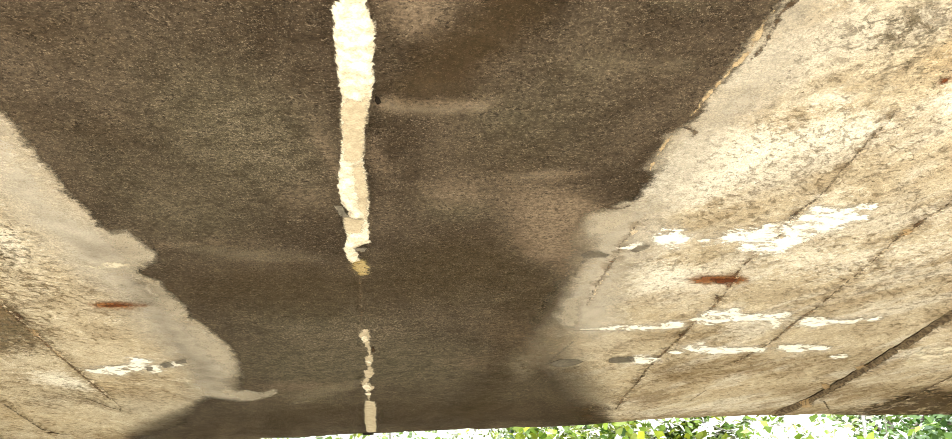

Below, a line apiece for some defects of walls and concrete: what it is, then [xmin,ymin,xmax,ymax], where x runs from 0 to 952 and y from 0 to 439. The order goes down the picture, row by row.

damp [413,0,537,94]
corrosion [689,276,748,287]
corrosion [92,302,145,310]